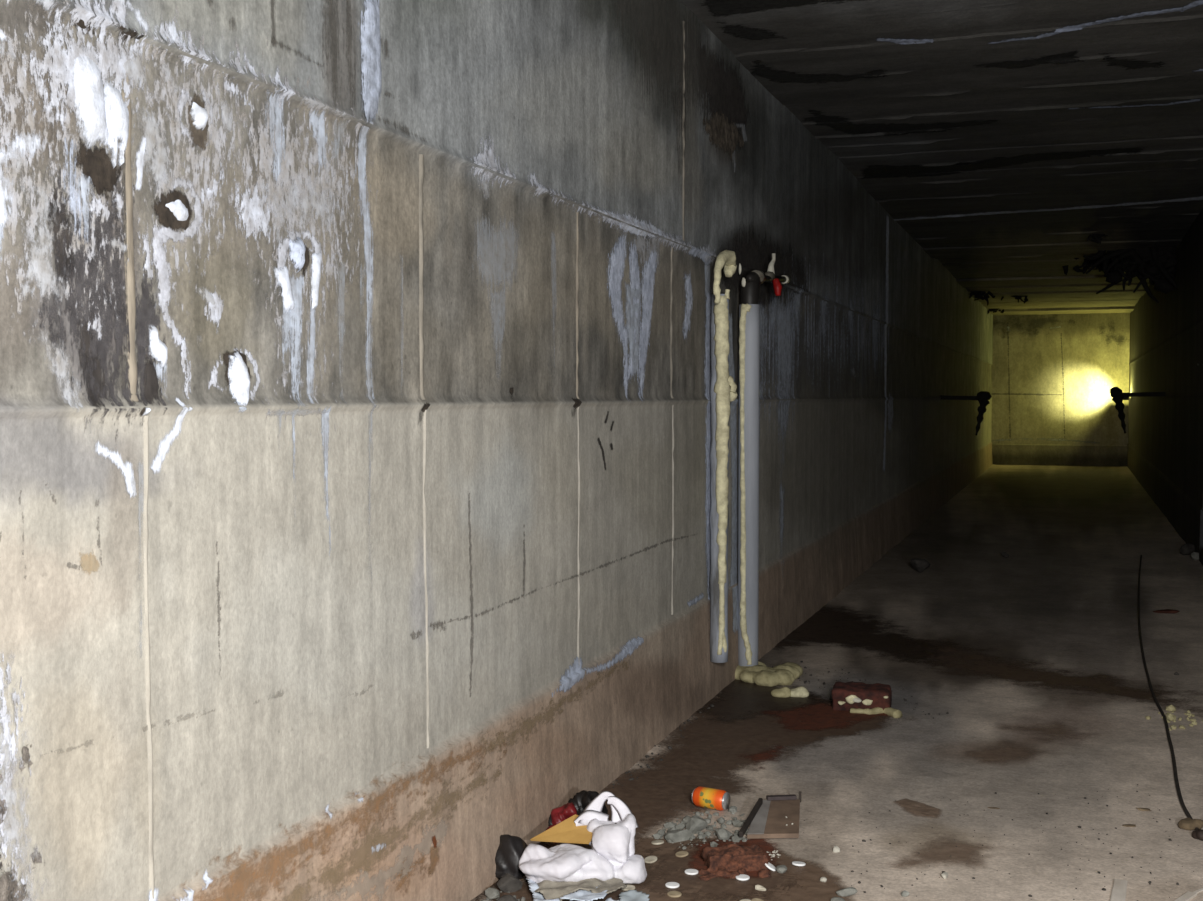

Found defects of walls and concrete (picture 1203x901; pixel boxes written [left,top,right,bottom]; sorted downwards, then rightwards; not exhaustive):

damp [988,0,1203,44]
hole [75,138,125,197]
damp [0,0,425,553]
damp [467,137,1203,631]
spalling [0,654,43,901]
rust [195,661,628,901]
crack [430,495,688,697]
efflorescence [552,637,644,697]